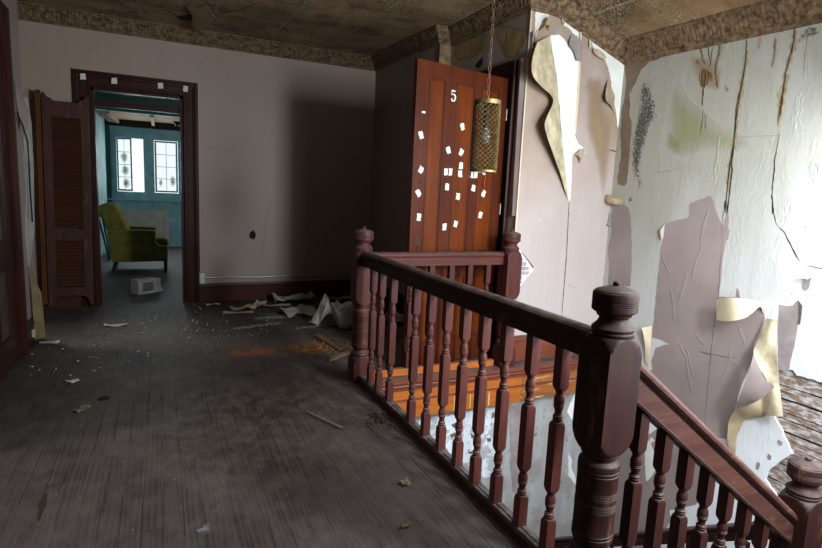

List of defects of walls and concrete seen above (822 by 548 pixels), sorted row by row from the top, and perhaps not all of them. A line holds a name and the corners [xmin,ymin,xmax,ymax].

peeling [532,12,624,201]
leakage [632,83,655,183]
corrosion [697,44,722,133]
crack [721,39,747,232]
corrosion [778,29,796,121]
crack [771,134,822,269]